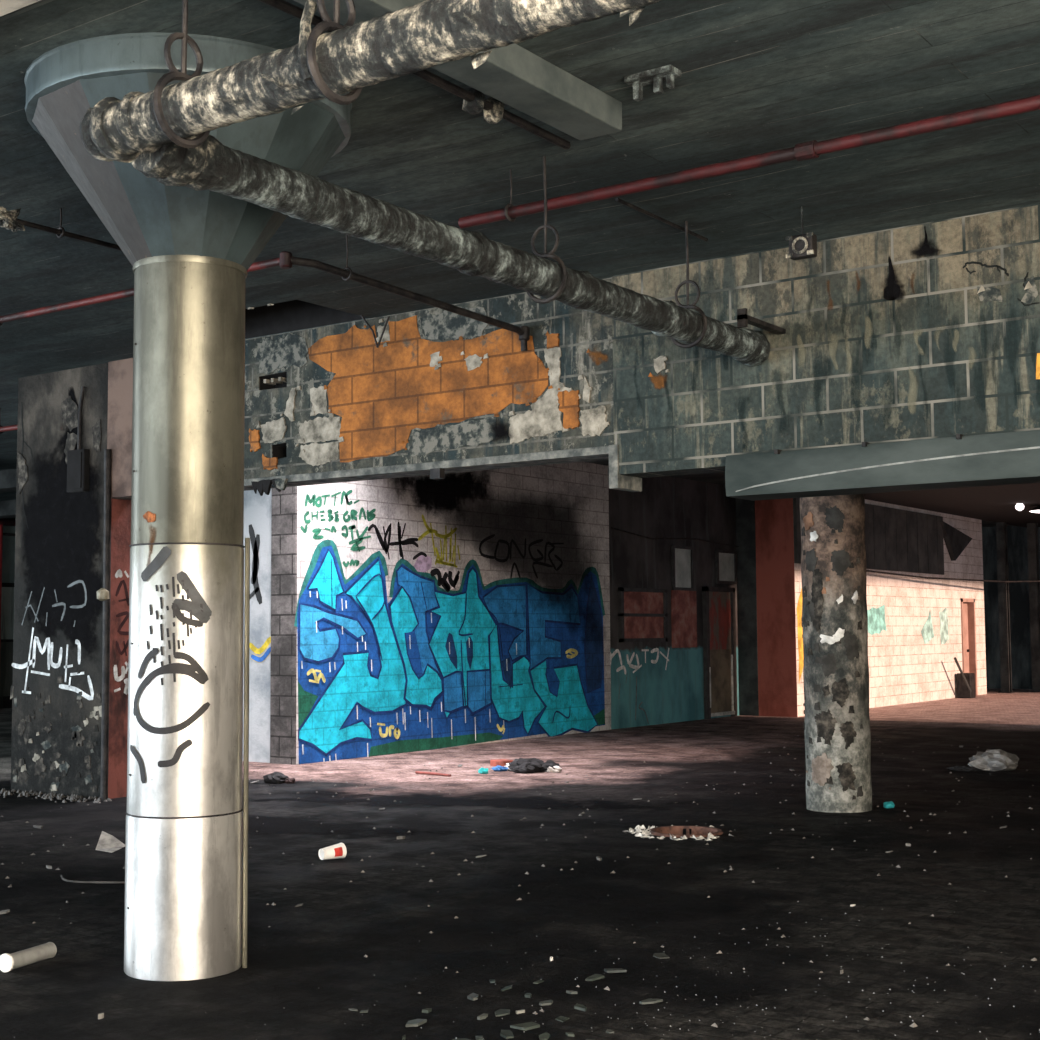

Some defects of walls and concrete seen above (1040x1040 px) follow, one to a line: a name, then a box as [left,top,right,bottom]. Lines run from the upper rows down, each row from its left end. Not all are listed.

peeling [249,306,610,496]
spalling [648,356,669,389]
peeling [801,506,863,800]